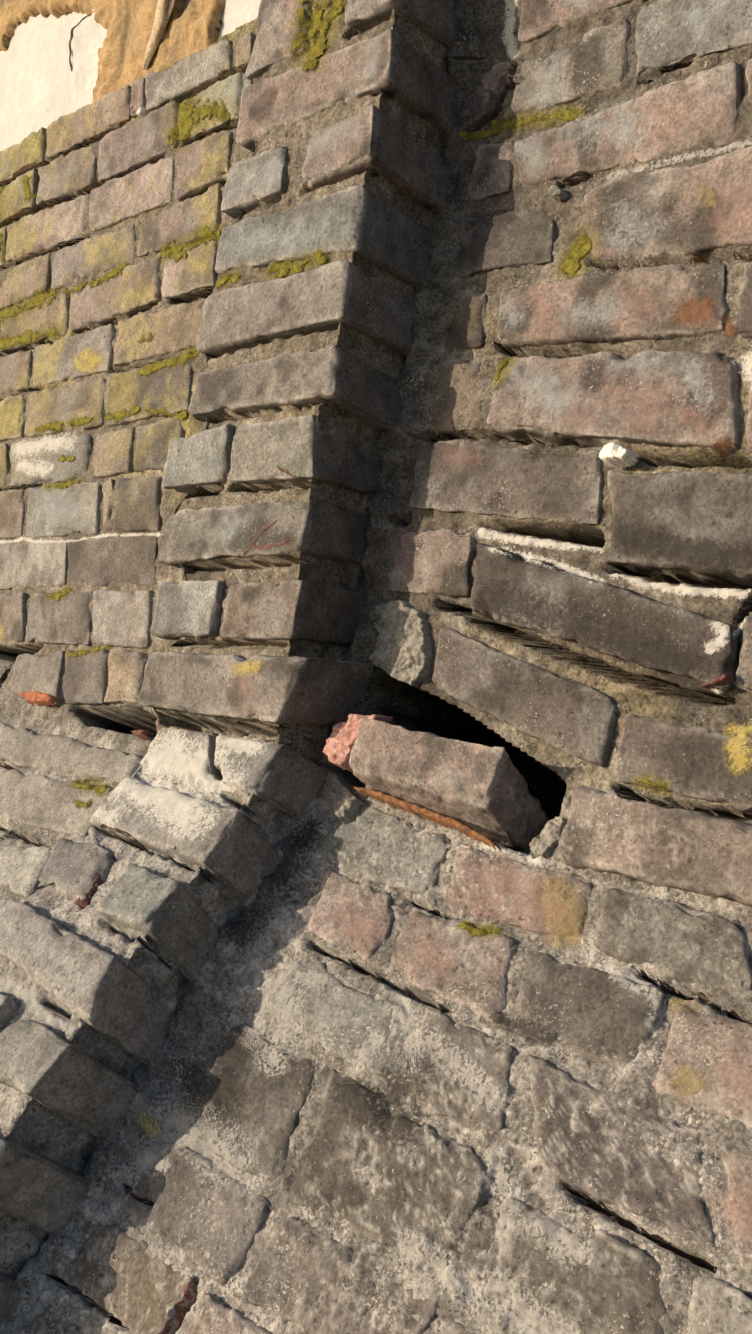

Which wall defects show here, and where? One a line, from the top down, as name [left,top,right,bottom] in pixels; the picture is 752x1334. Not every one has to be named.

peeling [0,9,107,151]
crack [69,14,99,90]
peeling [218,0,261,39]
spalling [323,714,501,850]